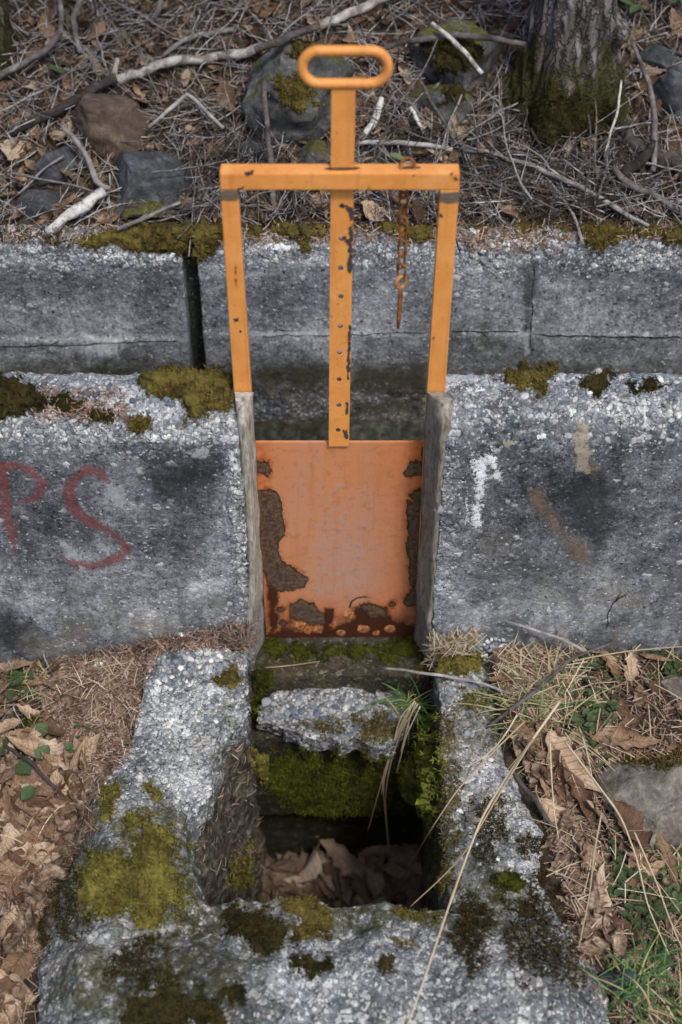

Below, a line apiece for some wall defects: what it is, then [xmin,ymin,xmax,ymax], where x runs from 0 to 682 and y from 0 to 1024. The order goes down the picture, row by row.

corrosion [265,585,415,638]